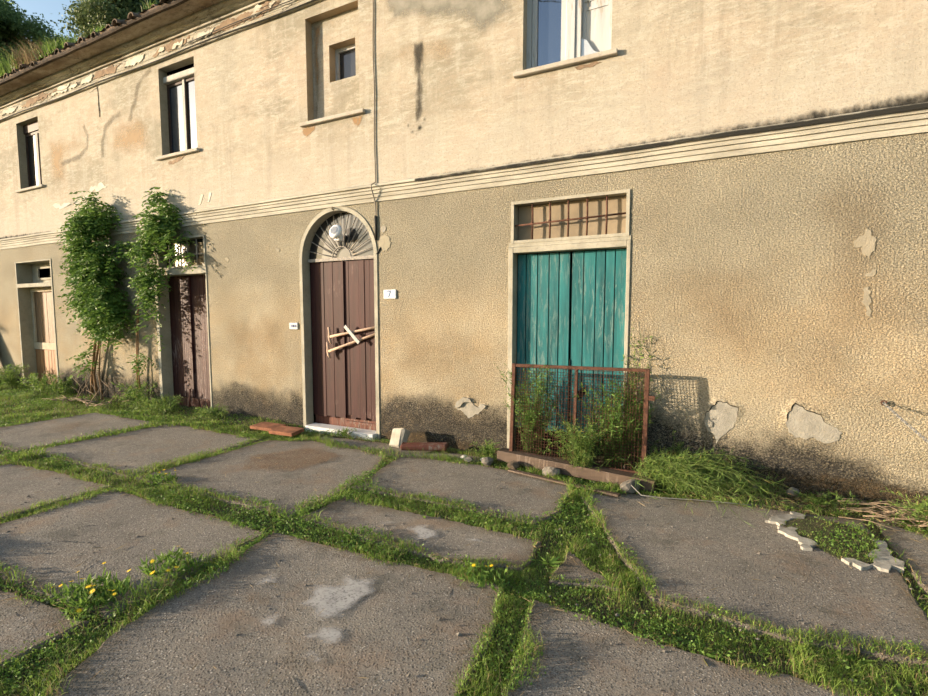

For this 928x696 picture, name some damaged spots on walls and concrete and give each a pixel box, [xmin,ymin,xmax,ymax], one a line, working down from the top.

crack [243,0,281,22]
flaking render [81,0,281,85]
flaking render [2,83,70,116]
crack [9,61,126,117]
damp [408,44,425,129]
damp [731,95,928,130]
damp [212,382,303,427]
damp [380,396,507,454]
flaking render [453,394,489,421]
flaking render [698,395,745,445]
flaking render [779,397,847,446]
damp [626,415,898,502]